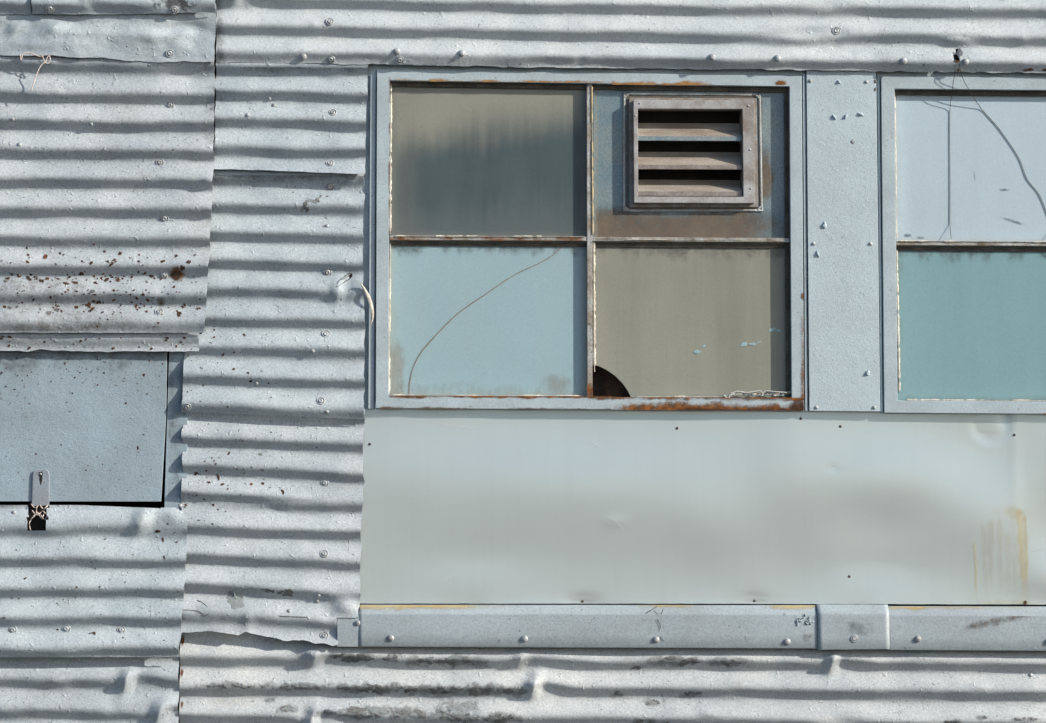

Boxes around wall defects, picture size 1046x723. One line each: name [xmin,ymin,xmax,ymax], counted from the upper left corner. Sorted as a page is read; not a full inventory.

corrosion [1,244,204,393]
crack [408,247,562,394]
corrosion [390,328,804,411]